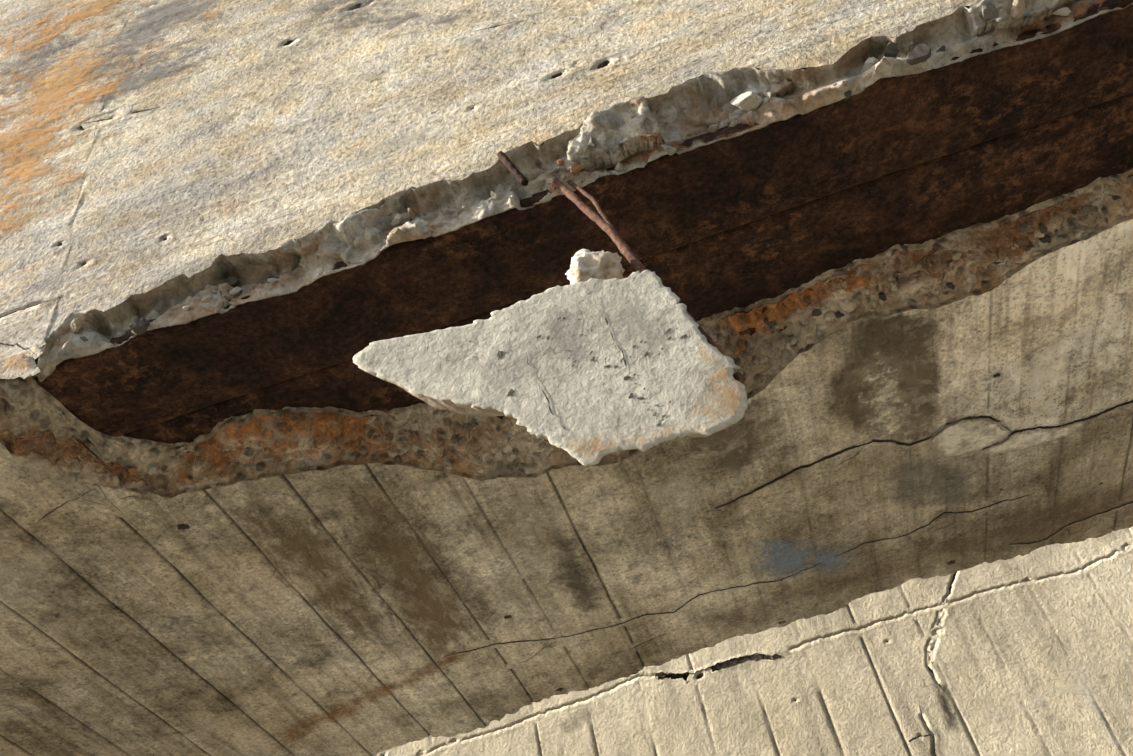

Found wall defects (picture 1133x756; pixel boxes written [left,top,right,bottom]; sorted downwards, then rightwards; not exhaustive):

corrosion [0,0,145,231]
corrosion [619,110,756,165]
spalling [0,0,1133,498]
corrosion [895,193,1092,285]
corrosion [721,263,877,355]
water stain [829,316,941,440]
crack [714,396,1133,509]
spalling [1116,539,1133,554]
crack [401,491,1133,756]